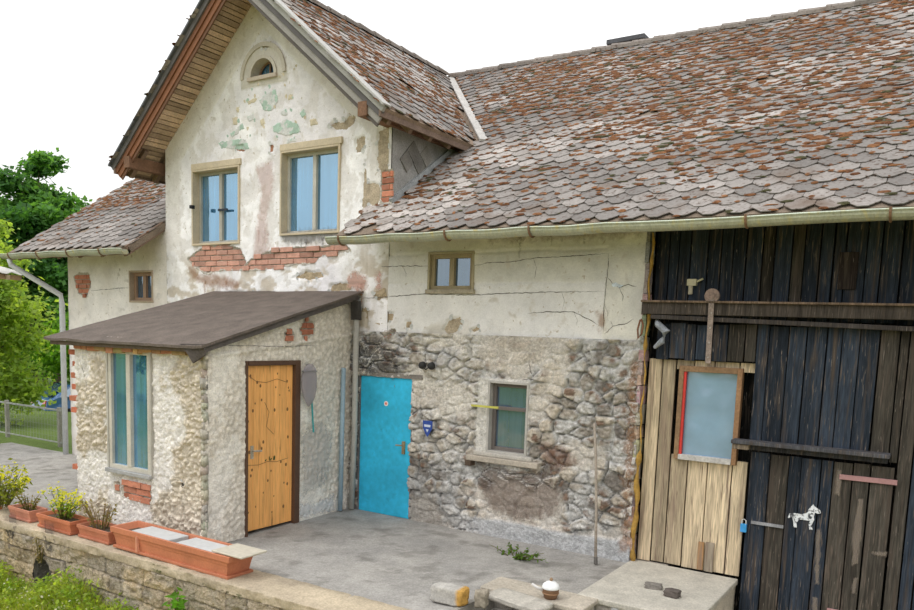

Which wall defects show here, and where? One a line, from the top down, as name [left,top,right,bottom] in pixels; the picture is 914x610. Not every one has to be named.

peeling [218,64,356,155]
spalling [356,128,395,208]
flaking render [187,244,351,283]
flaking render [73,272,91,298]
spalling [327,283,351,291]
crack [360,253,636,332]
flaking render [284,317,316,343]